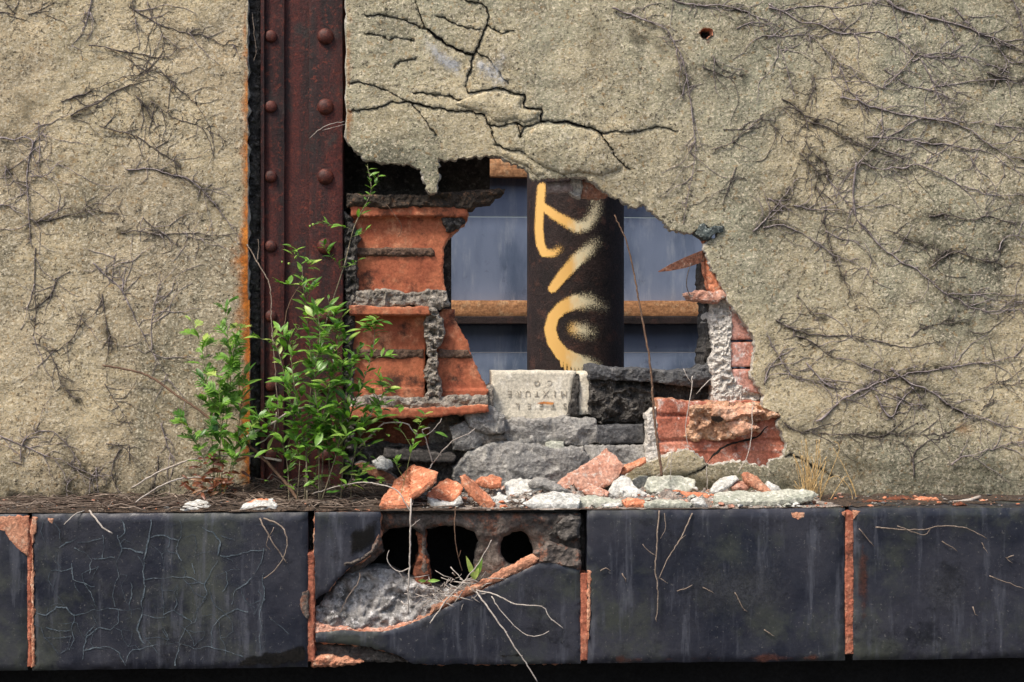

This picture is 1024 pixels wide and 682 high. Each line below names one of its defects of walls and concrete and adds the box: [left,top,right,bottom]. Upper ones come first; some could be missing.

crack [348,0,676,169]
spalling [699,28,713,39]
corrosion [238,134,250,484]
spalling [344,124,787,508]
spalling [0,515,54,667]
crack [36,520,290,666]
spalling [344,535,382,566]
spalling [300,554,539,668]